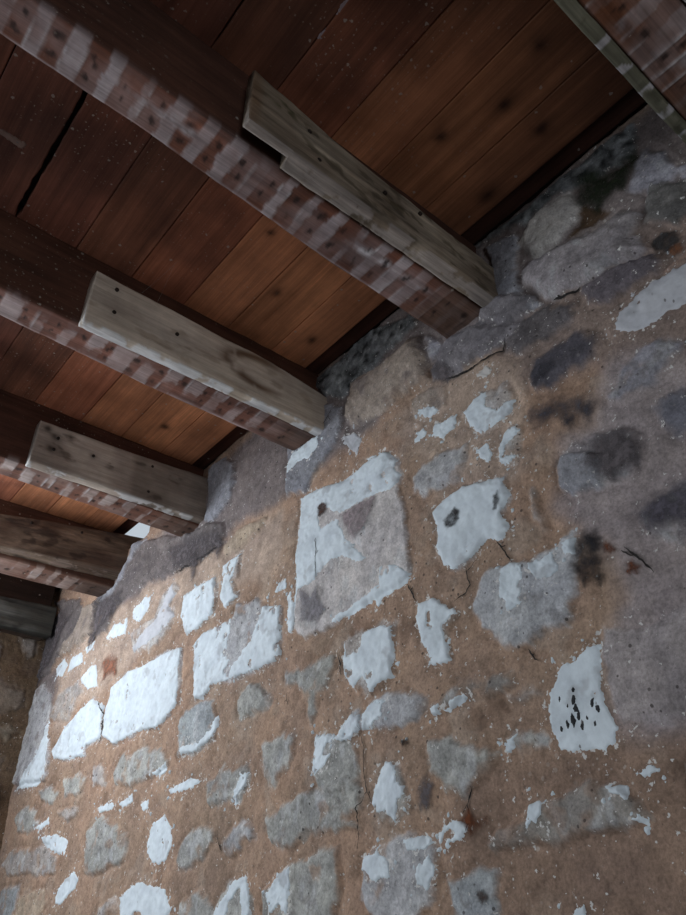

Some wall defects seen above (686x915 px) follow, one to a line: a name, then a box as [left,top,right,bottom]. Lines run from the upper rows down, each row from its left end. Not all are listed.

crack [448,338,505,379]